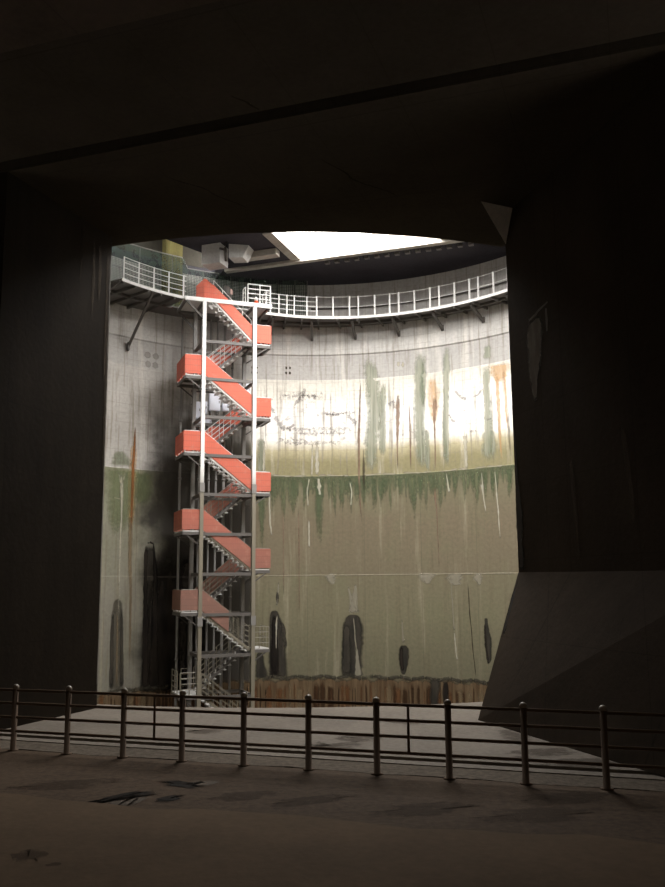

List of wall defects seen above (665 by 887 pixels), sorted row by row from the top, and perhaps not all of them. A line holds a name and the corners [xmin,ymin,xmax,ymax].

corrosion [128,429,136,652]
damp [109,476,206,692]
damp [263,442,352,505]
damp [256,574,489,704]
damp [366,436,504,532]
damp [448,572,512,664]